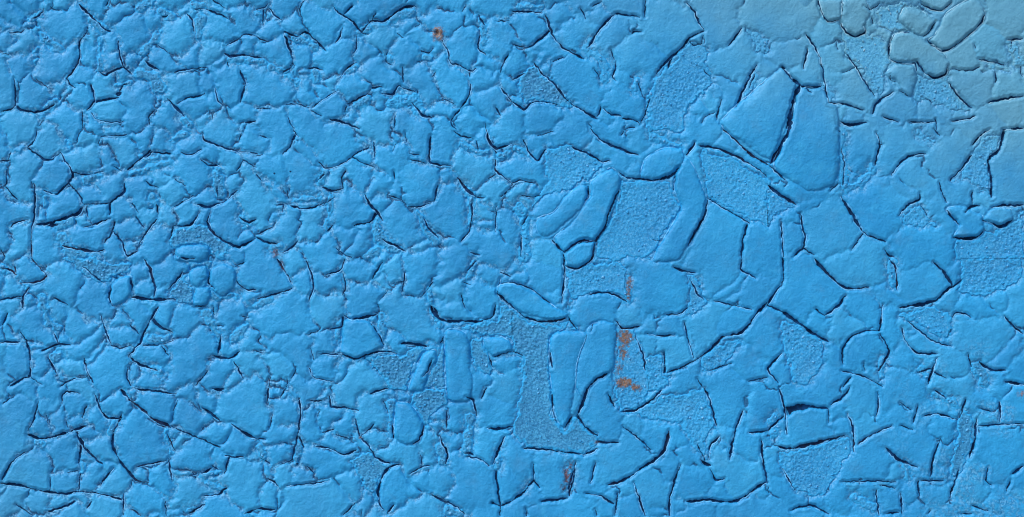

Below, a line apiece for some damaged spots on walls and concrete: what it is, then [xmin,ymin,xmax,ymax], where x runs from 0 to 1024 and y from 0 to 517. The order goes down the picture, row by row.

crack [0,0,432,516]
crack [195,0,679,516]
peeling [334,37,716,457]
corrosion [615,330,640,390]
peeling [700,149,793,226]
peeling [780,321,824,386]
peeling [779,437,851,497]
crack [616,1,1024,516]